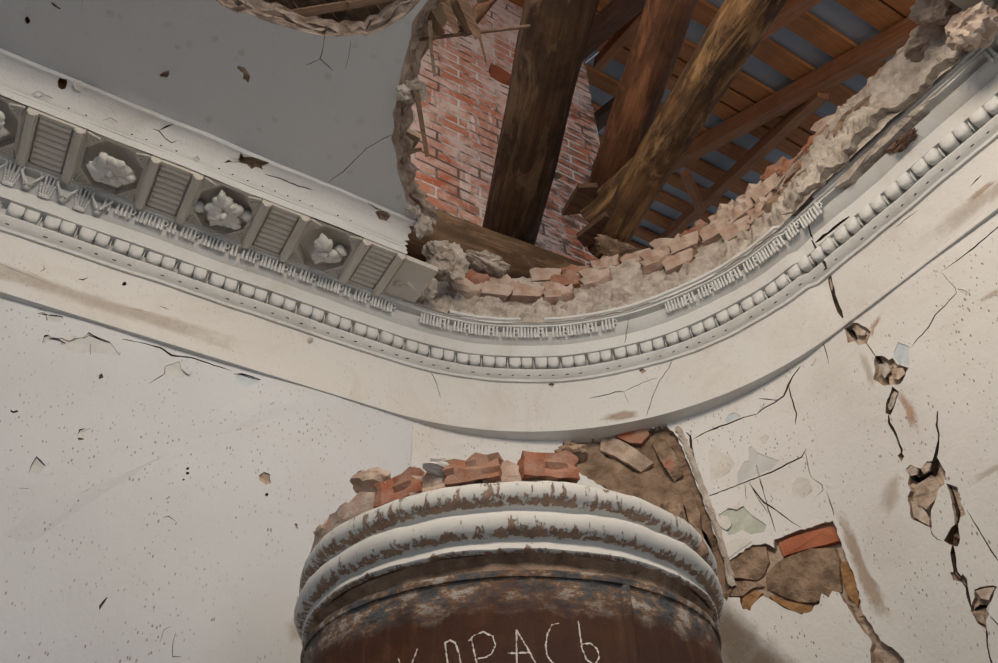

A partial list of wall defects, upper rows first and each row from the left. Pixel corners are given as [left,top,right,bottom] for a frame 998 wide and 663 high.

spalling [216,0,440,85]
spalling [224,154,269,170]
spalling [391,100,440,226]
spalling [368,203,390,221]
crack [123,339,231,371]
crack [589,362,672,413]
crack [686,216,998,663]
spalling [570,425,904,663]